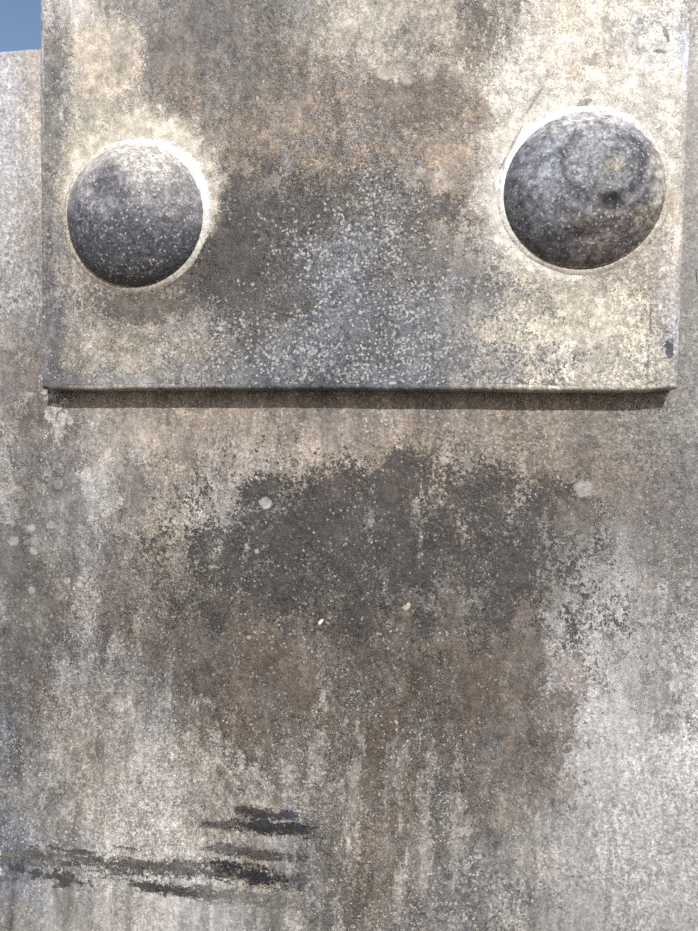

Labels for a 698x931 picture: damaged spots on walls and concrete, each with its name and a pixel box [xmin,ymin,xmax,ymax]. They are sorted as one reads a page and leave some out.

water stain [0,275,698,931]